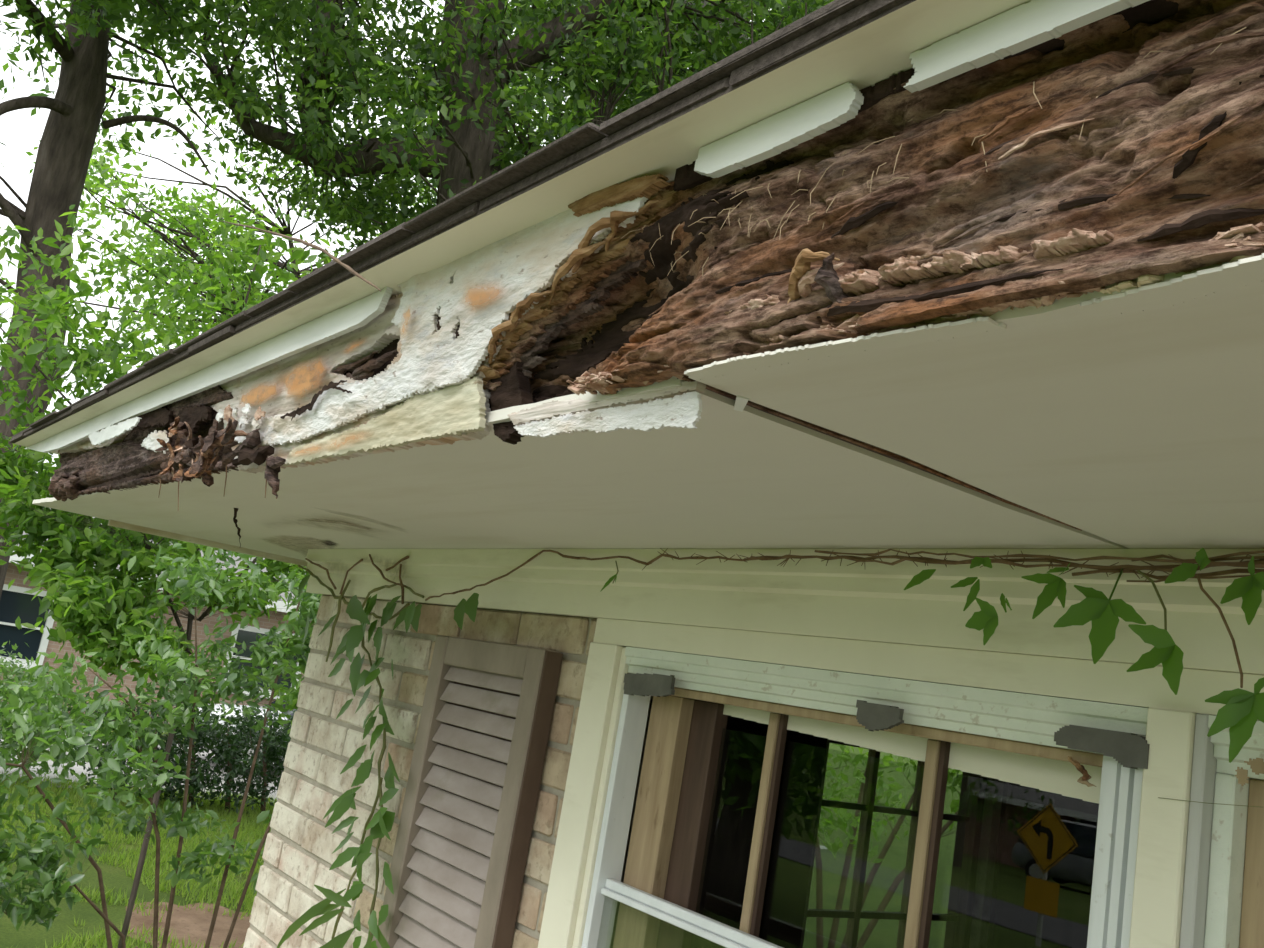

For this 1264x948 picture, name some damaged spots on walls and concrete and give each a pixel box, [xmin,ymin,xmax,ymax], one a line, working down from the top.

peeling [137,173,681,484]
peeling [507,317,1007,438]
peeling [1080,253,1264,317]
crack [677,375,1082,531]
peeling [1235,758,1264,786]